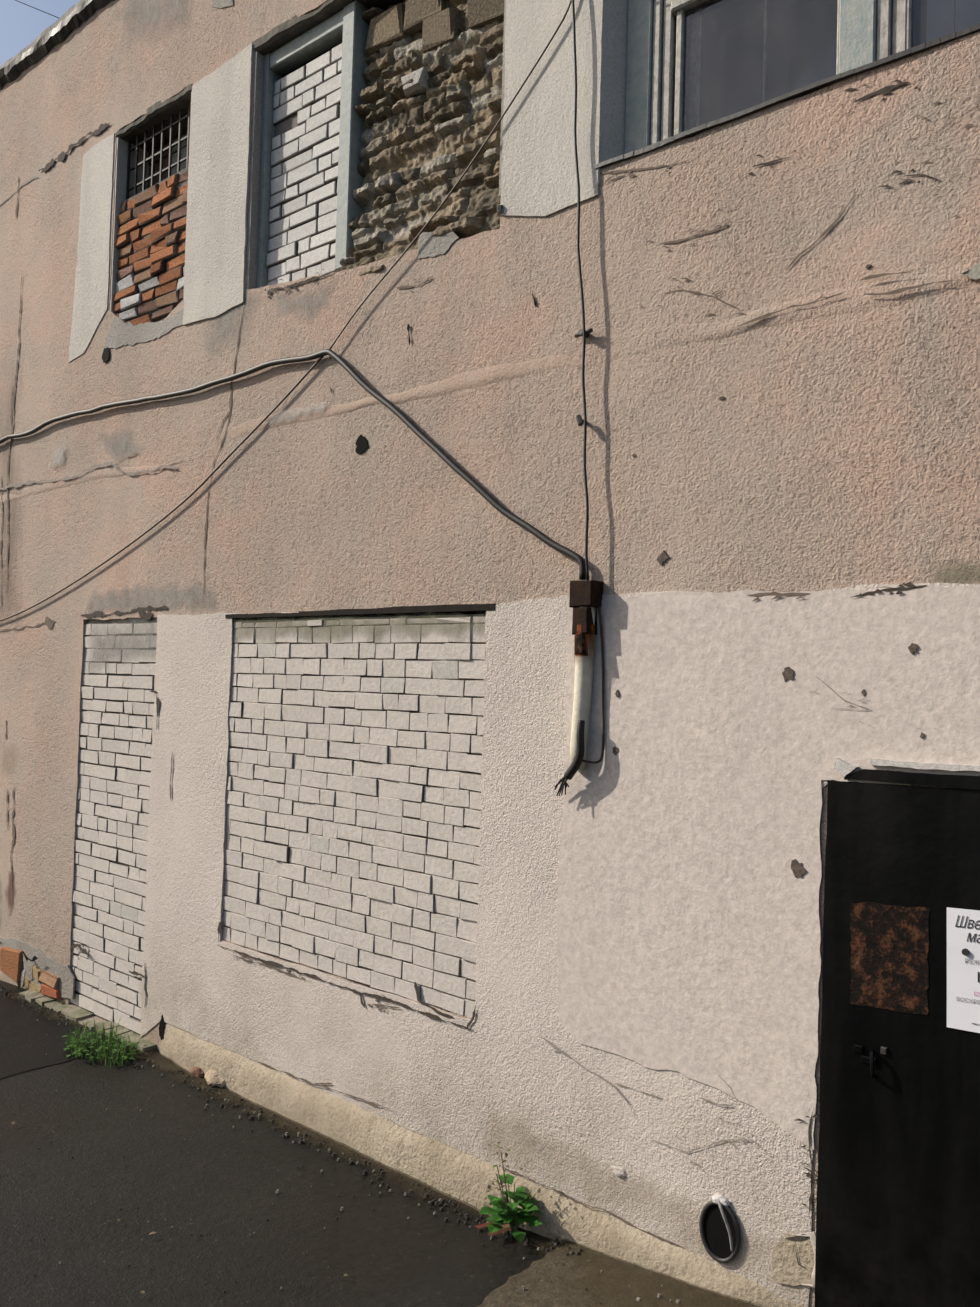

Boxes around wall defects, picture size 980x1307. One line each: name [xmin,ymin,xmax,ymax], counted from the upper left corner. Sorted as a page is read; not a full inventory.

spalling [339,0,504,276]
crack [786,189,859,270]
crack [734,272,955,328]
spalling [747,590,810,601]
spalling [850,581,927,598]
spalling [0,937,75,1005]
crack [217,921,476,1031]
crack [542,1037,663,1120]
crack [699,1074,737,1106]
crack [501,1166,688,1250]
crack [786,1234,808,1269]